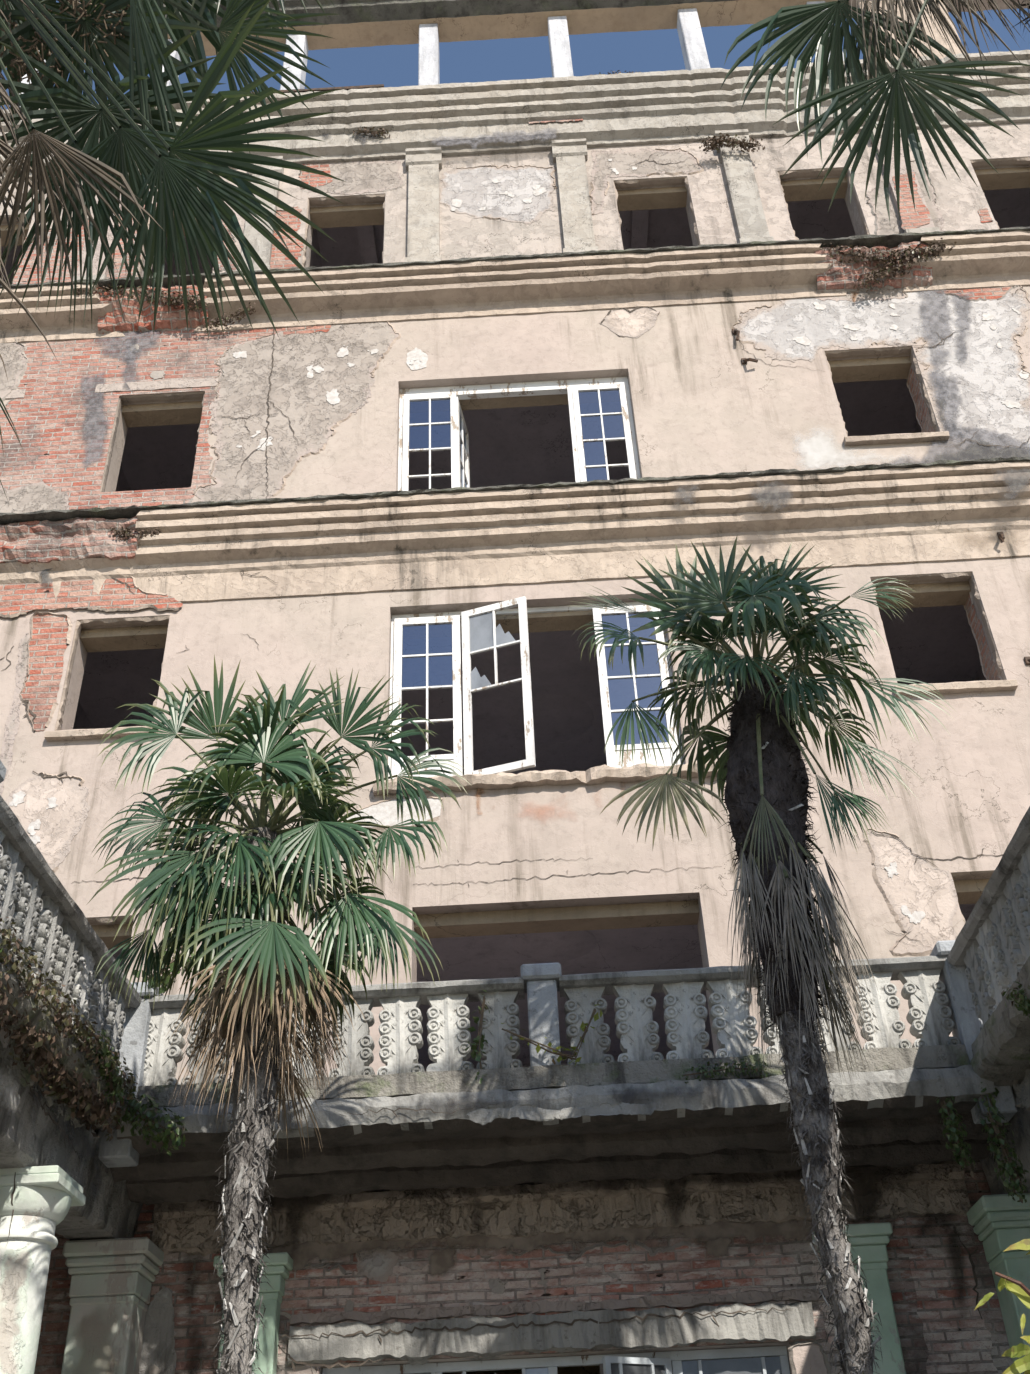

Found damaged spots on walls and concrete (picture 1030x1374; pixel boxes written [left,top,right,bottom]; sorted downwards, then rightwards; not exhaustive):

peeling [439,165,557,225]
flaking render [866,159,944,235]
flaking render [0,321,428,510]
peeling [731,280,1030,446]
damp [800,290,1030,498]
flaking render [0,576,183,733]
flaking render [5,772,90,872]
flaking render [863,828,958,956]